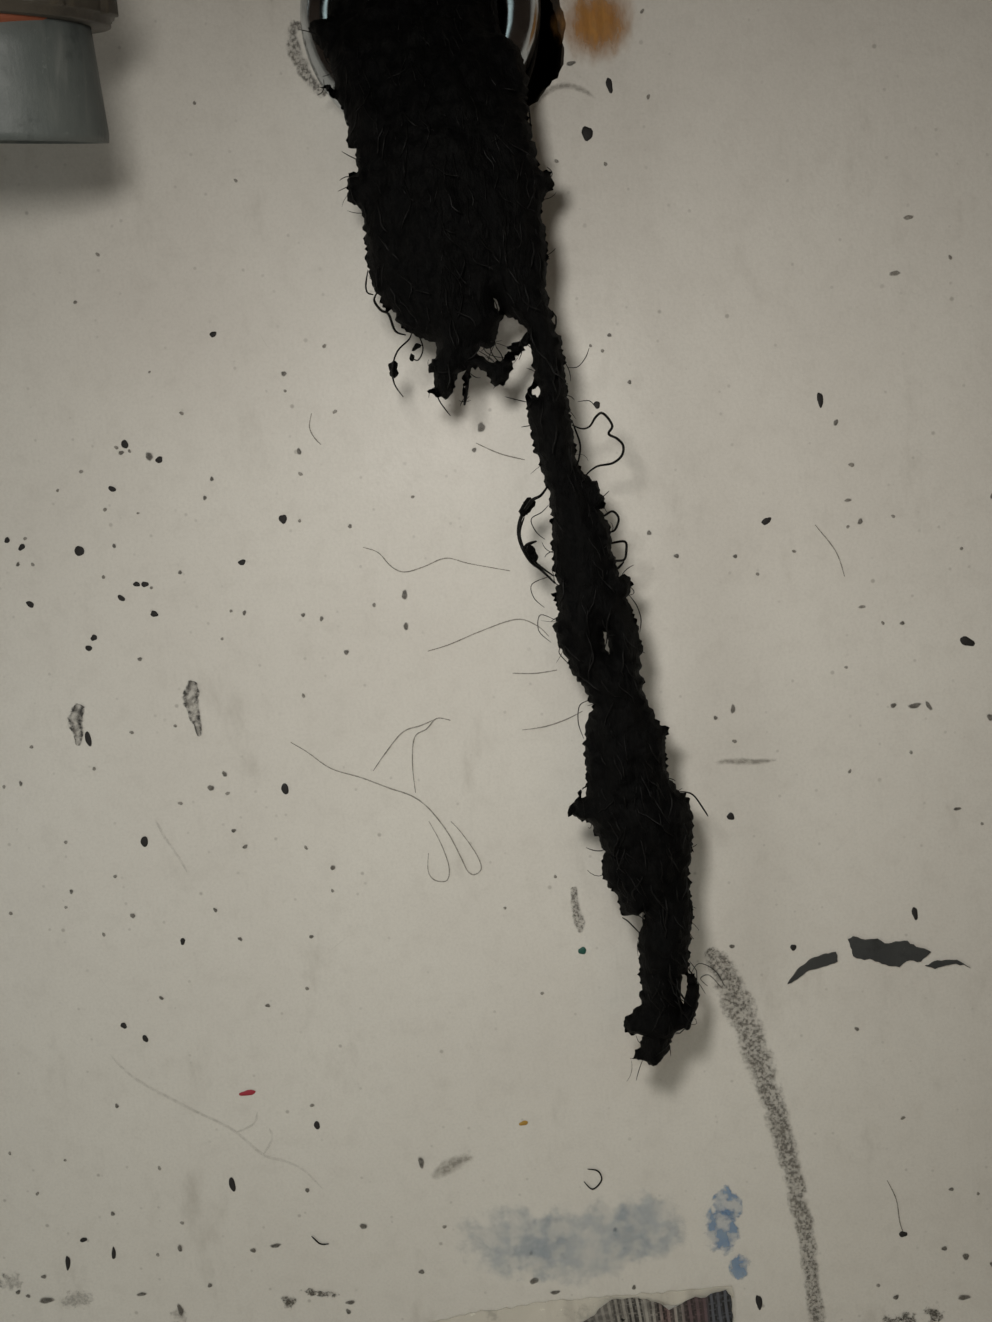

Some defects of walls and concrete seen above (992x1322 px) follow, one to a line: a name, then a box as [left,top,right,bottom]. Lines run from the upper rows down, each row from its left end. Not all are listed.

rust [572,0,624,51]
peeling [788,936,970,984]